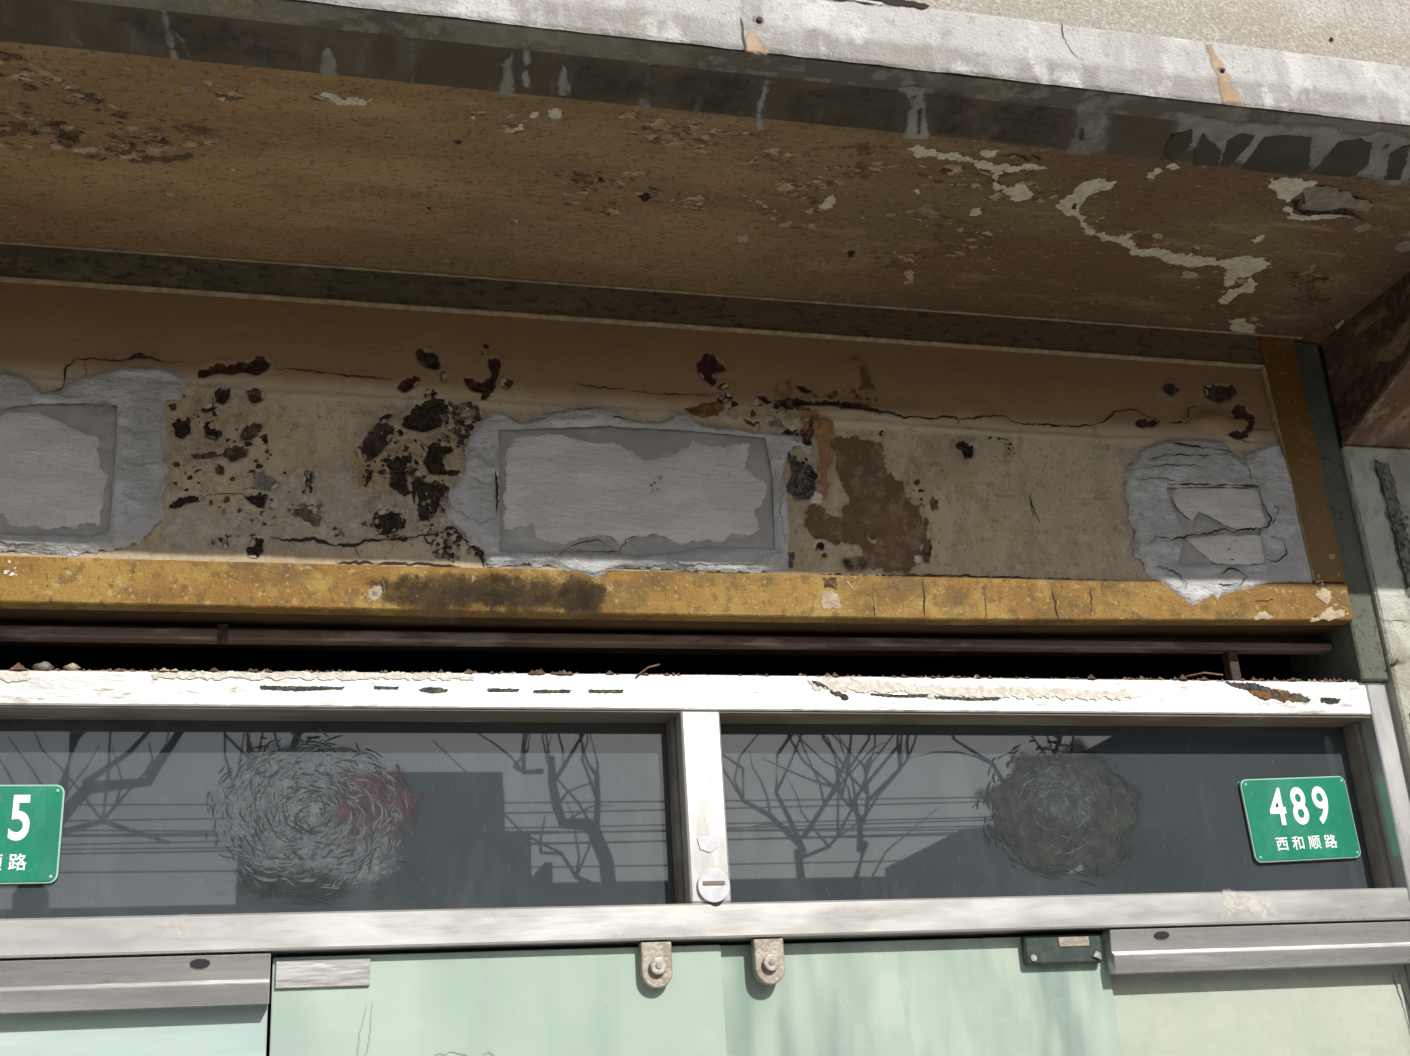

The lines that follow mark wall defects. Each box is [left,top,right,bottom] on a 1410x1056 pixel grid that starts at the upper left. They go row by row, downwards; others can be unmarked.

crack [833,0,929,9]
crack [739,17,747,51]
peeling [0,51,222,164]
peeling [300,86,371,106]
peeling [500,108,562,133]
peeling [619,112,1333,333]
spalling [1268,177,1376,233]
rust [198,356,271,378]
peeling [784,430,939,574]
crack [559,382,1287,589]
leakage [372,575,606,615]
peeling [821,577,855,609]